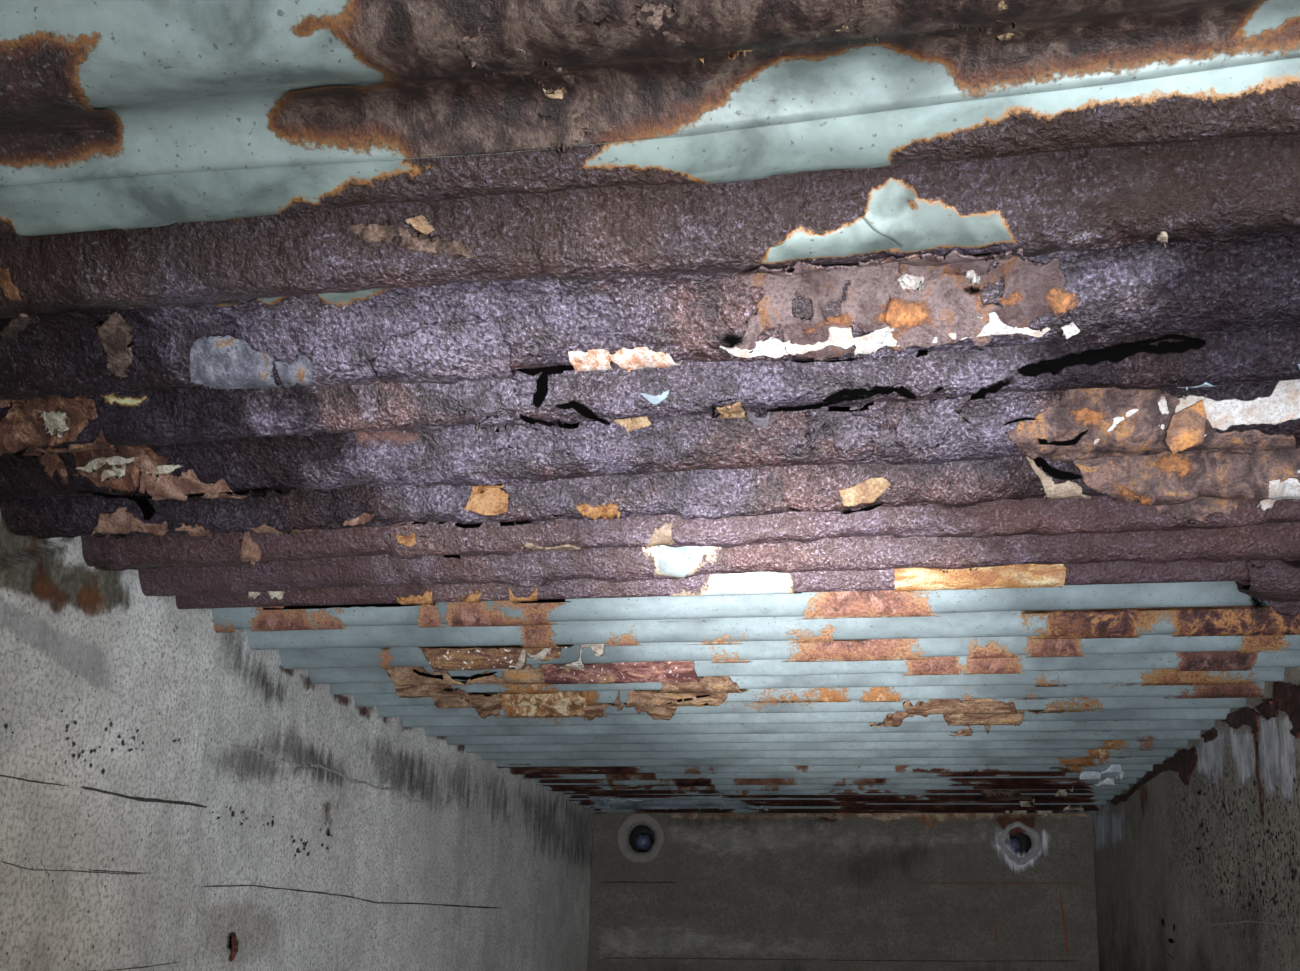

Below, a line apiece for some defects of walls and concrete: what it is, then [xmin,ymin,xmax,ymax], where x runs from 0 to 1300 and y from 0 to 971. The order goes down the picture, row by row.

corrosion [0,31,124,170]
corrosion [266,0,1300,159]
peeling [719,312,1080,358]
peeling [1085,364,1300,445]
peeling [75,456,182,482]
corrosion [1027,457,1092,499]
peeling [1256,469,1300,511]
corrosion [497,560,1300,834]
efflorescence [1197,717,1295,801]
crack [0,775,207,808]
crack [0,861,139,877]
crack [201,885,499,908]